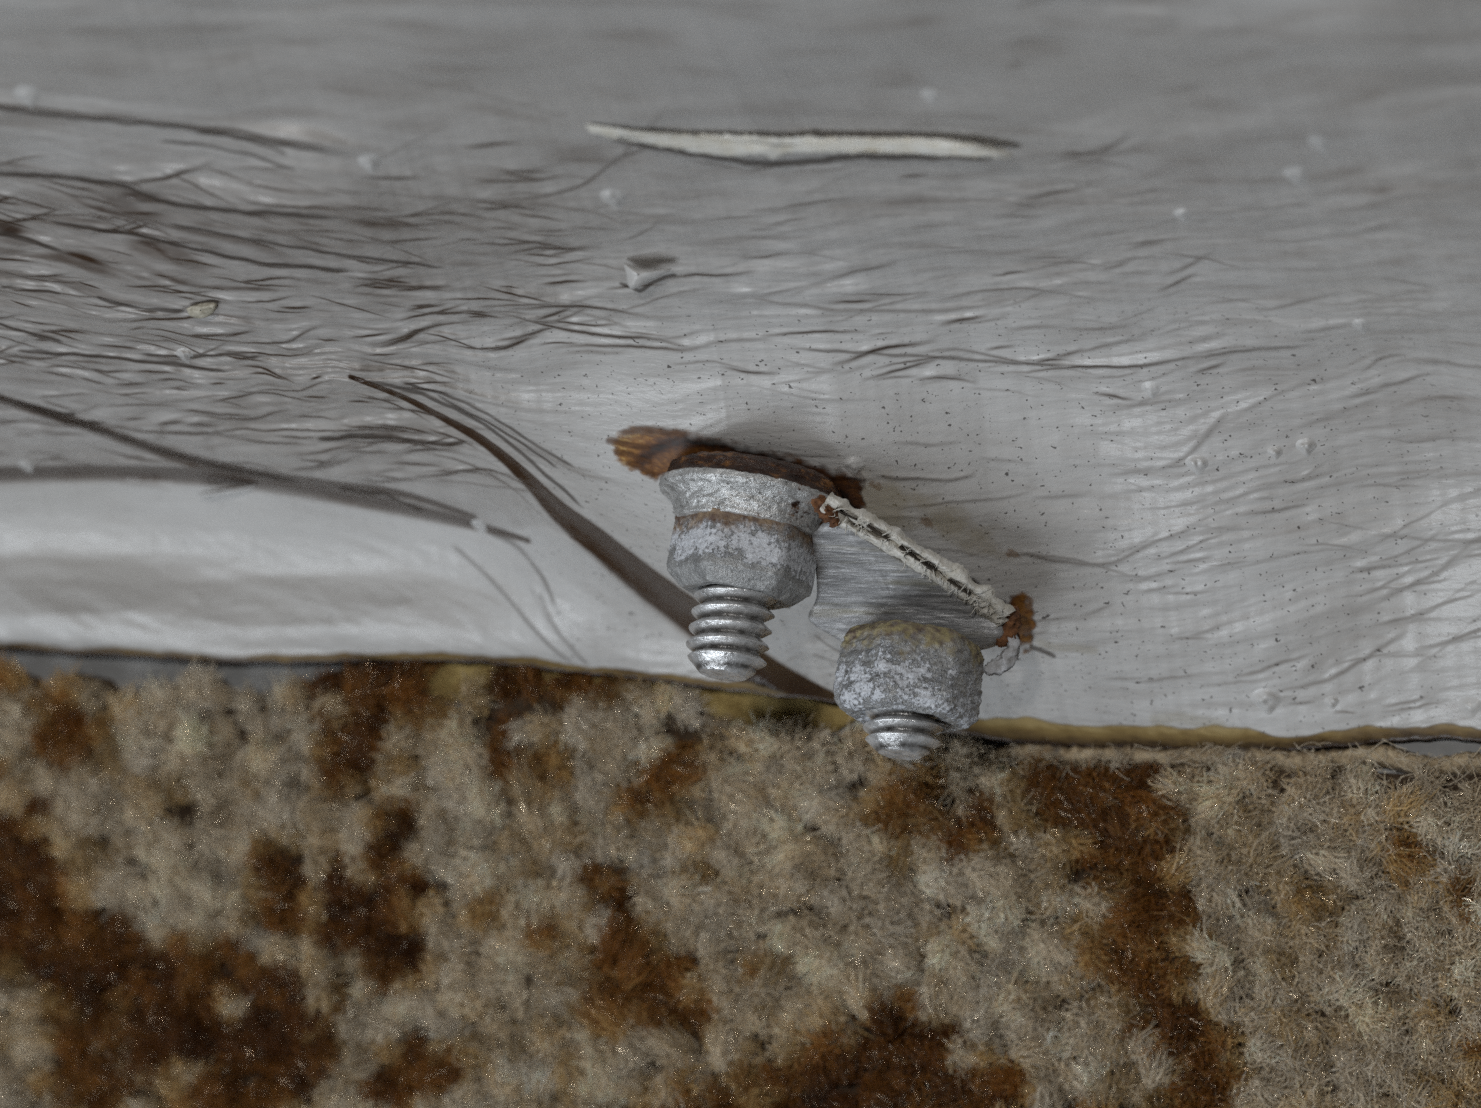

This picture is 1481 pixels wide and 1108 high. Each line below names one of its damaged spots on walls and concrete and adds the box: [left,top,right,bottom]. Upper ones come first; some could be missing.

peeling [586,124,1013,166]
corrosion [607,428,865,528]
peeling [820,492,1015,629]
corrosion [984,593,1036,676]